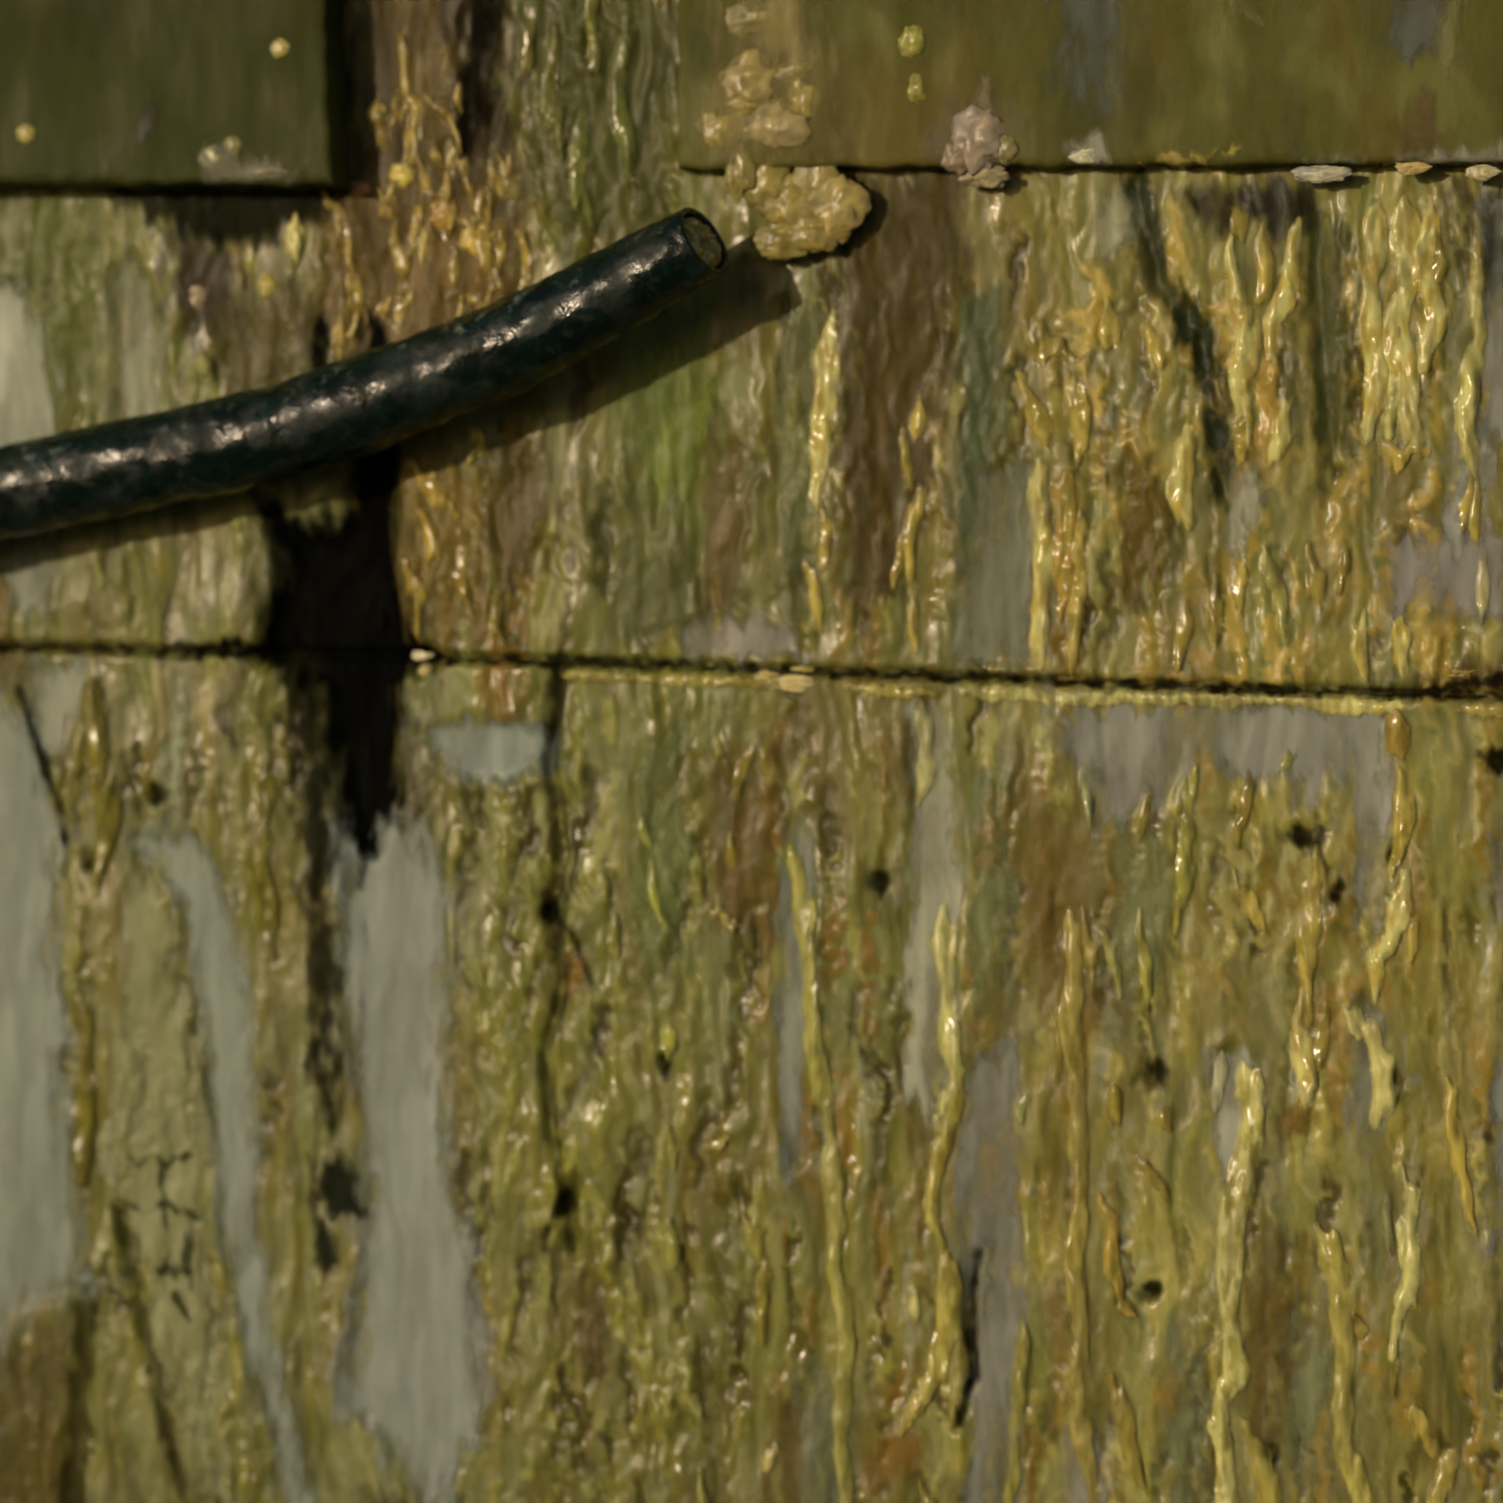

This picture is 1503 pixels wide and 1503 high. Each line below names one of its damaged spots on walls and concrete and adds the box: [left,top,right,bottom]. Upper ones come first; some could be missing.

spalling [1068,133,1107,166]
spalling [1136,146,1241,169]
spalling [1290,157,1355,183]
spalling [1394,145,1503,233]
damp [464,419,485,467]
peeling [1390,294,1503,625]
damp [162,443,509,1132]
peeling [1061,687,1171,840]
peeling [1215,694,1394,859]
peeling [0,654,95,1319]
peeling [113,829,315,1503]
peeling [329,810,493,1503]